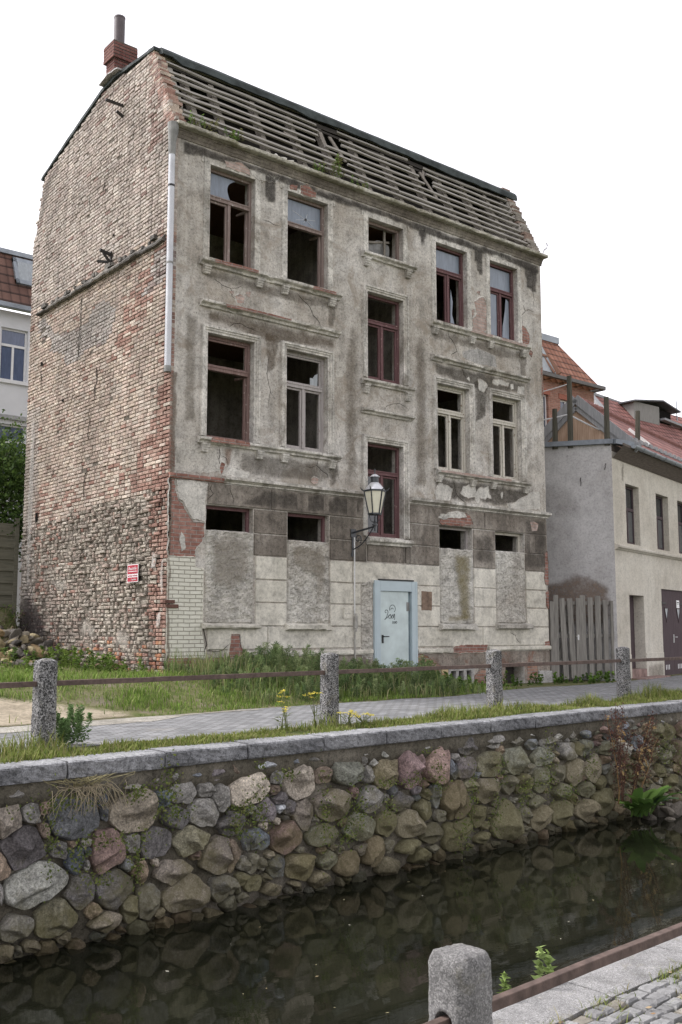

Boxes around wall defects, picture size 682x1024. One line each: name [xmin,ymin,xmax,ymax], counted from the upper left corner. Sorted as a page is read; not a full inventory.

flaking render [225,160,317,199]
flaking render [471,291,533,357]
flaking render [433,470,541,532]
flaking render [165,437,251,671]